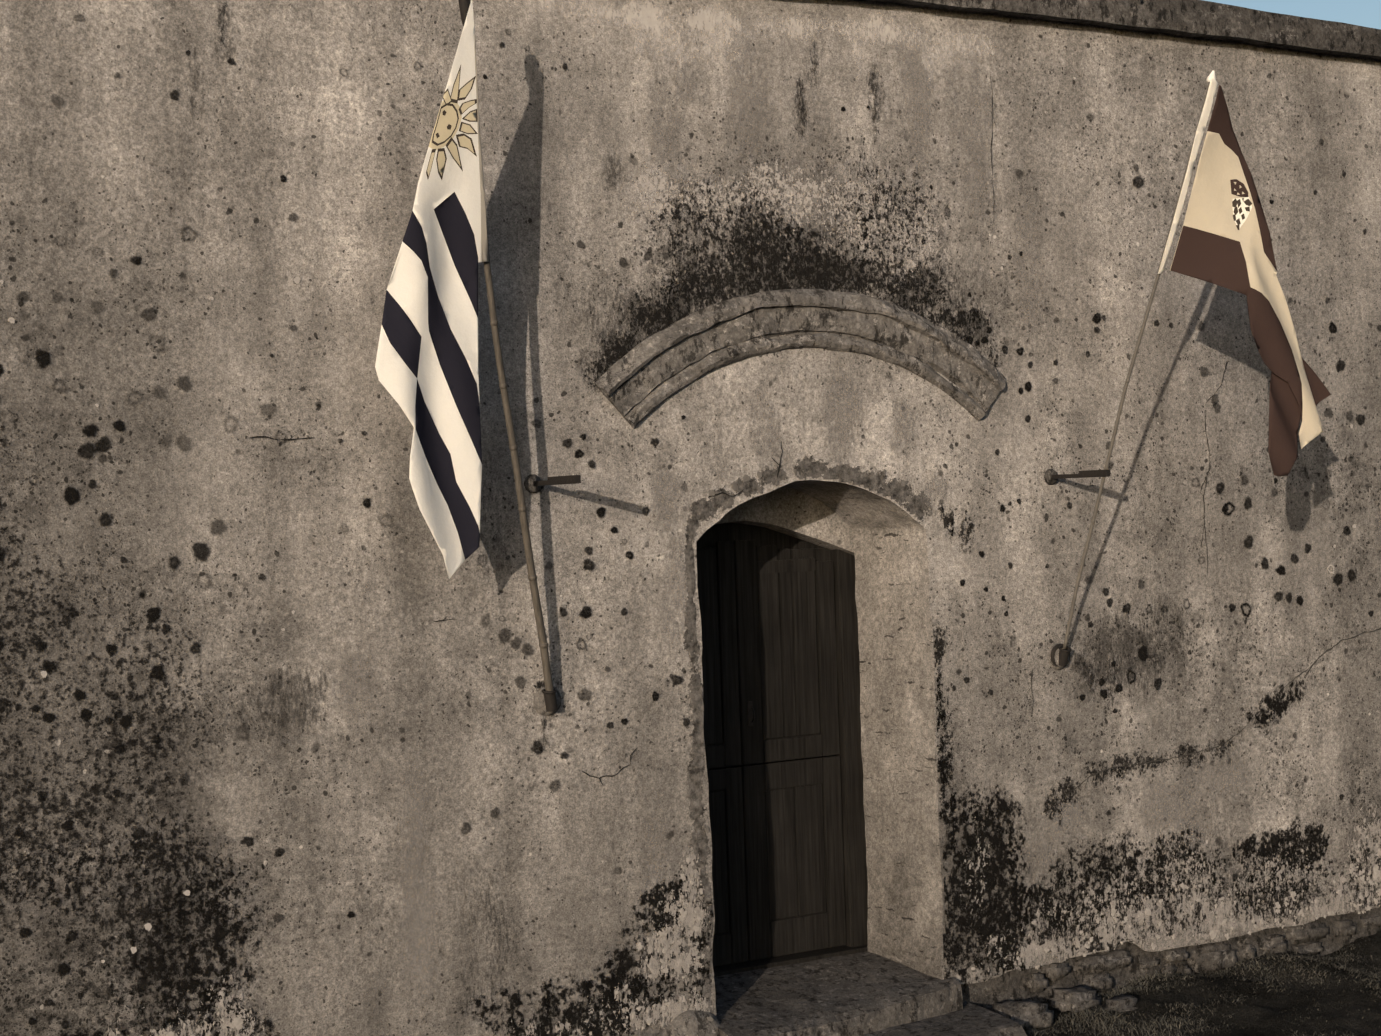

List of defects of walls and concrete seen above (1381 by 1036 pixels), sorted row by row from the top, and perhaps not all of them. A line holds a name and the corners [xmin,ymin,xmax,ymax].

water stain [506,0,1005,390]
water stain [0,410,274,1036]
water stain [241,671,326,727]
water stain [1072,604,1183,705]
crack [1047,717,1255,812]
water stain [933,621,1381,984]
crack [1284,627,1381,688]
water stain [461,864,714,1036]